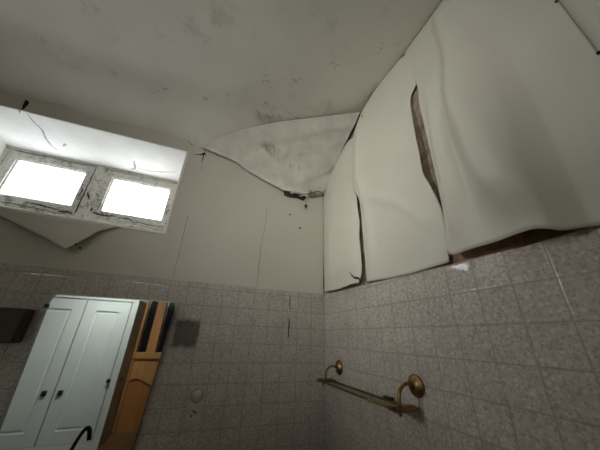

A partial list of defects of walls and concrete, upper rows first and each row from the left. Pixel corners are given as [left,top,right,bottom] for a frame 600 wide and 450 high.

crack [27,113,67,150]
flaking render [413,88,443,212]
flaking render [450,226,593,264]